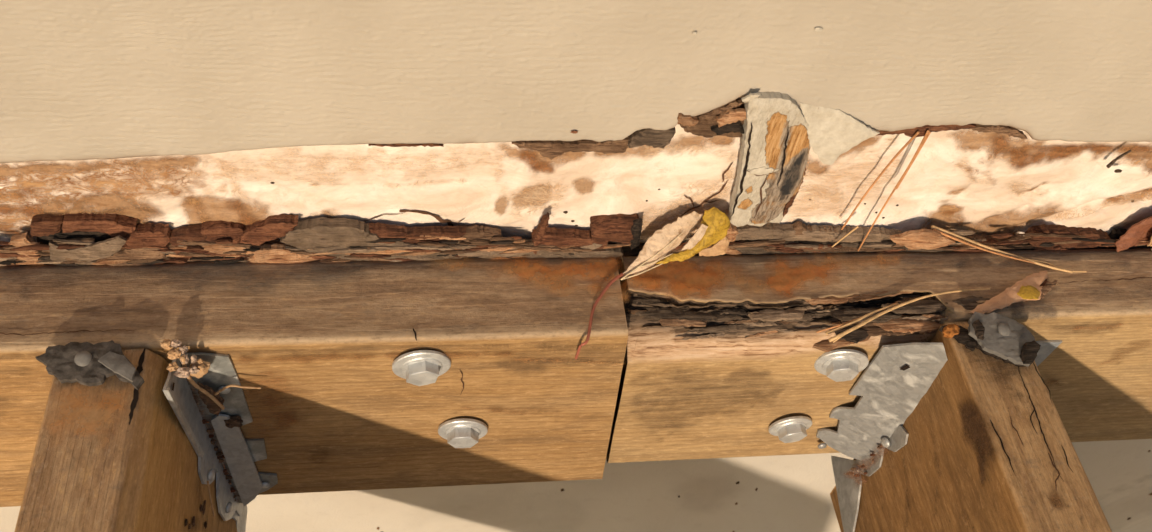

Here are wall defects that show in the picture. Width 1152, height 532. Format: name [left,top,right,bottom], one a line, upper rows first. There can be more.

peeling [49,235,127,262]
damp [0,157,267,234]
rust [508,259,619,293]
damp [495,135,733,214]
rust [631,257,835,297]
peeling [728,91,880,227]
damp [804,137,891,214]
damp [921,189,1092,235]
damp [953,131,1152,173]
damp [1106,189,1152,205]
crack [0,329,146,425]
crack [990,362,1074,491]